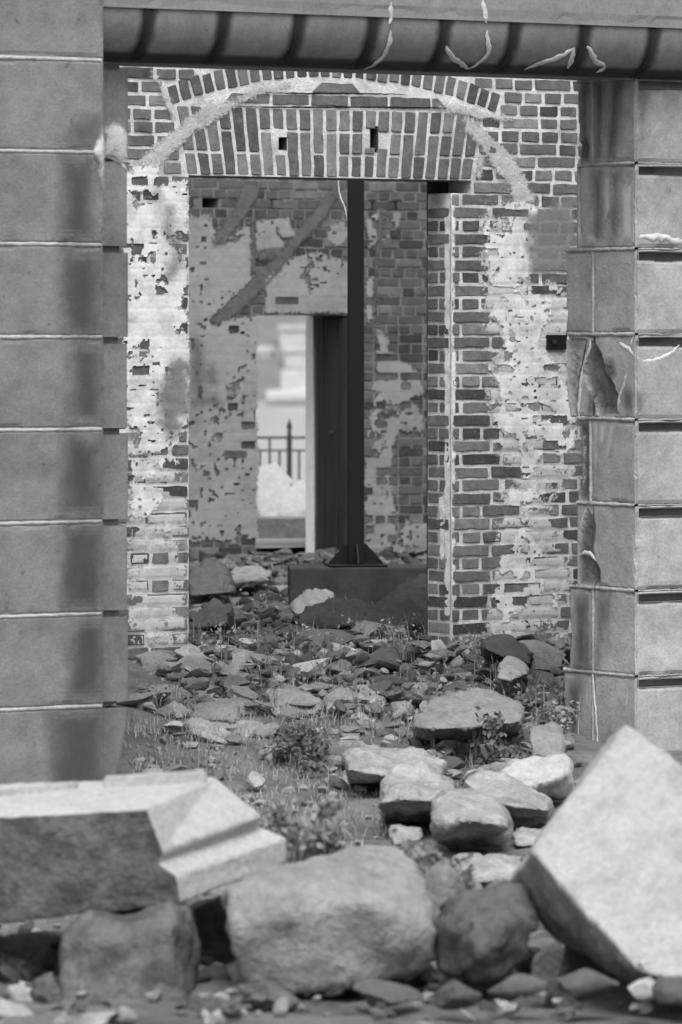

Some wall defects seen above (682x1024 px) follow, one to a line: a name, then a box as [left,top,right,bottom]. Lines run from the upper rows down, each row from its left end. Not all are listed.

crack [445,0,492,70]
crack [525,46,606,73]
flaking render [365,208,401,249]
crack [639,233,682,245]
flaking render [122,162,347,648]
flaking render [364,276,427,551]
peeling [475,199,619,638]
crack [577,338,591,416]
crack [617,336,680,412]
crack [579,505,596,561]